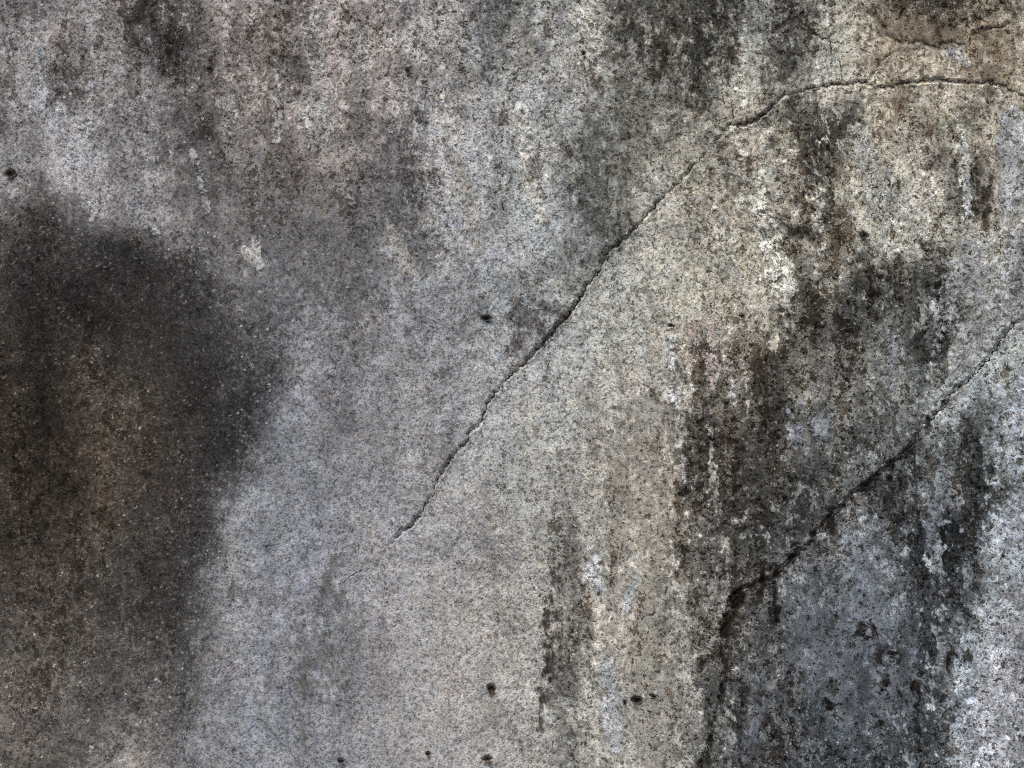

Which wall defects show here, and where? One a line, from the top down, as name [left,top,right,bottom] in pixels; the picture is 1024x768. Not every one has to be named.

leakage [0,0,484,768]
leakage [513,103,549,222]
leakage [510,303,563,350]
crack [342,10,1024,583]
leakage [535,0,1024,768]
crack [699,320,1024,768]